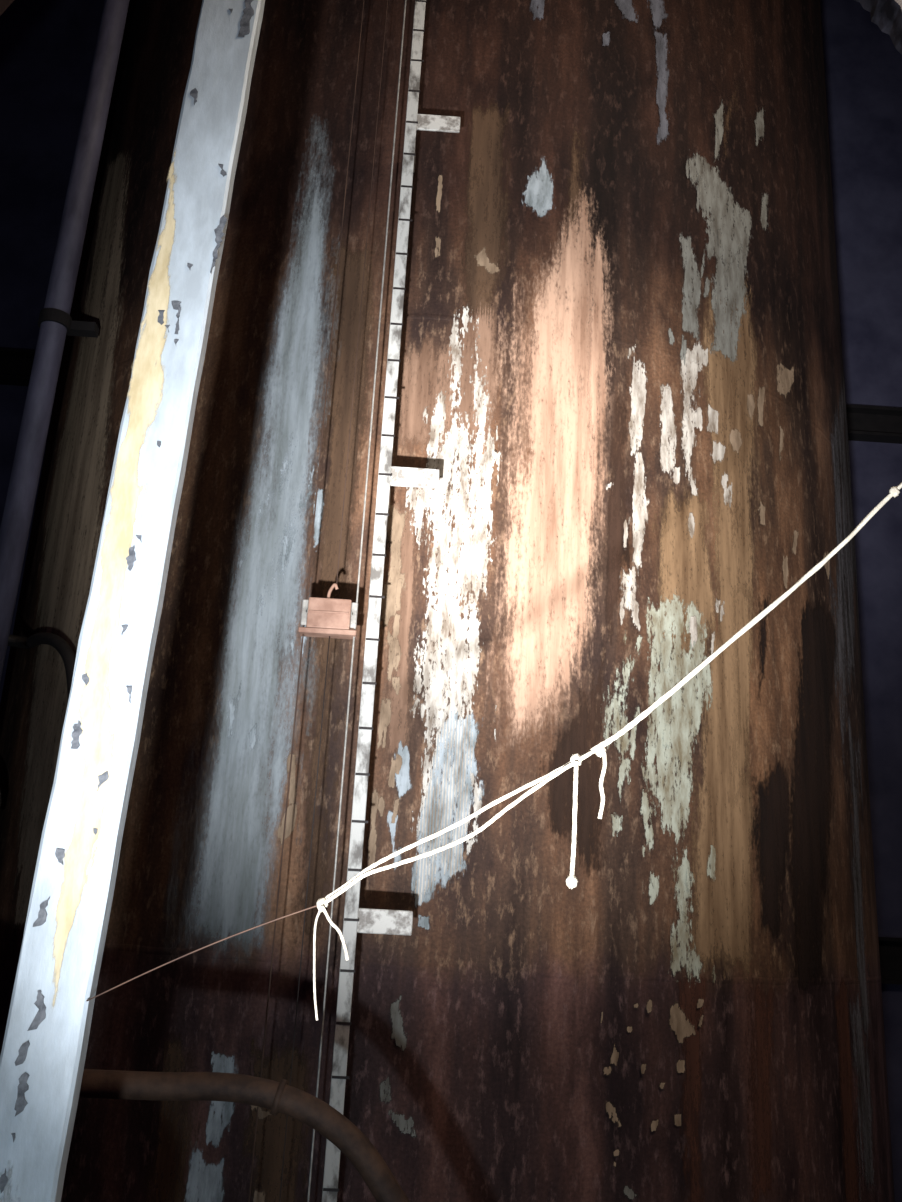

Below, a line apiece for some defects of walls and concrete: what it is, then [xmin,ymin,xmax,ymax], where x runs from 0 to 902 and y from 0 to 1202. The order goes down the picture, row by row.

peeling [615,0,669,143]
peeling [523,160,554,217]
corrosion [393,104,613,750]
peeling [747,363,794,427]
peeling [603,104,768,983]
corrosion [377,500,415,760]
peeling [368,306,501,930]
corrosion [657,288,759,978]
peeling [184,1101,235,1202]
peeling [211,1052,236,1074]
peeling [606,1101,621,1127]
peeling [669,999,704,1043]